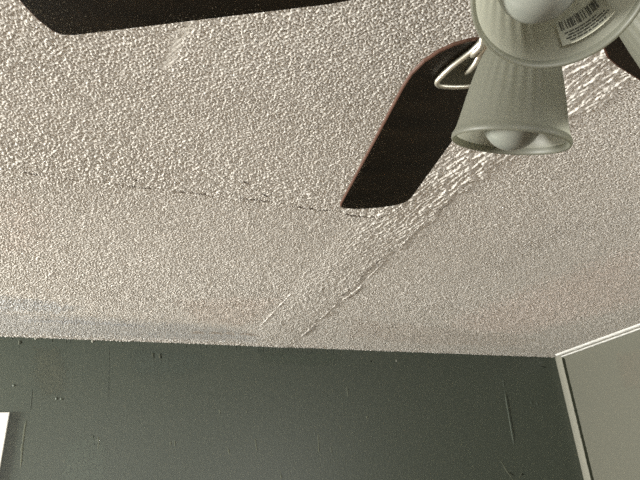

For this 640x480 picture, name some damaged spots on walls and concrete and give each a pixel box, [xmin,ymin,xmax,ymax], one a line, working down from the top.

crack [239,181,383,218]